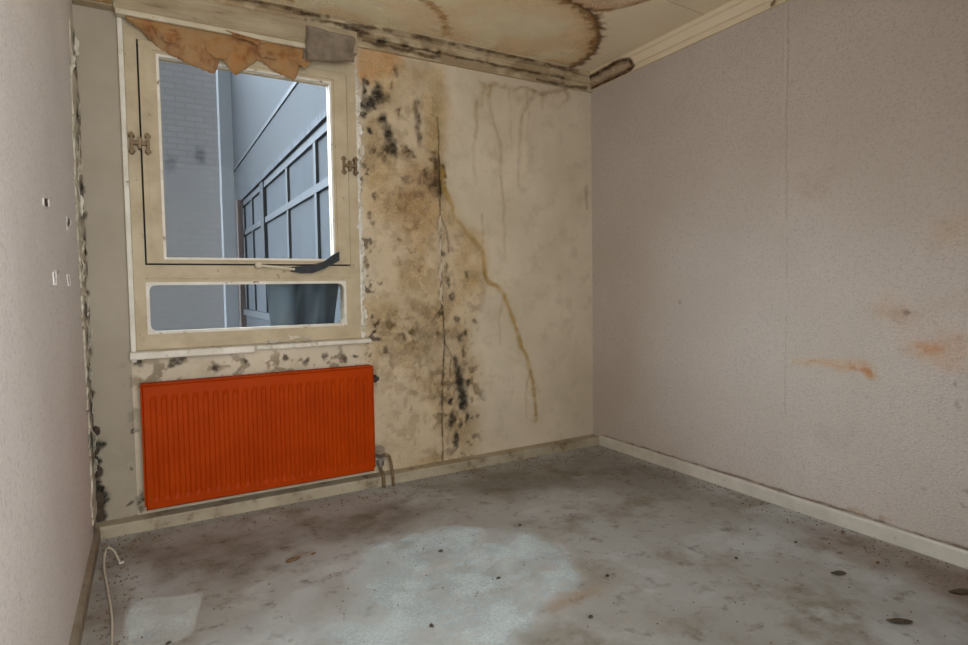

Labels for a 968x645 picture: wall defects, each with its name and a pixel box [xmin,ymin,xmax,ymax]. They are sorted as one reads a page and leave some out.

leakage [548,0,649,79]
leakage [285,0,539,218]
leakage [437,354,469,441]
leakage [94,426,109,526]